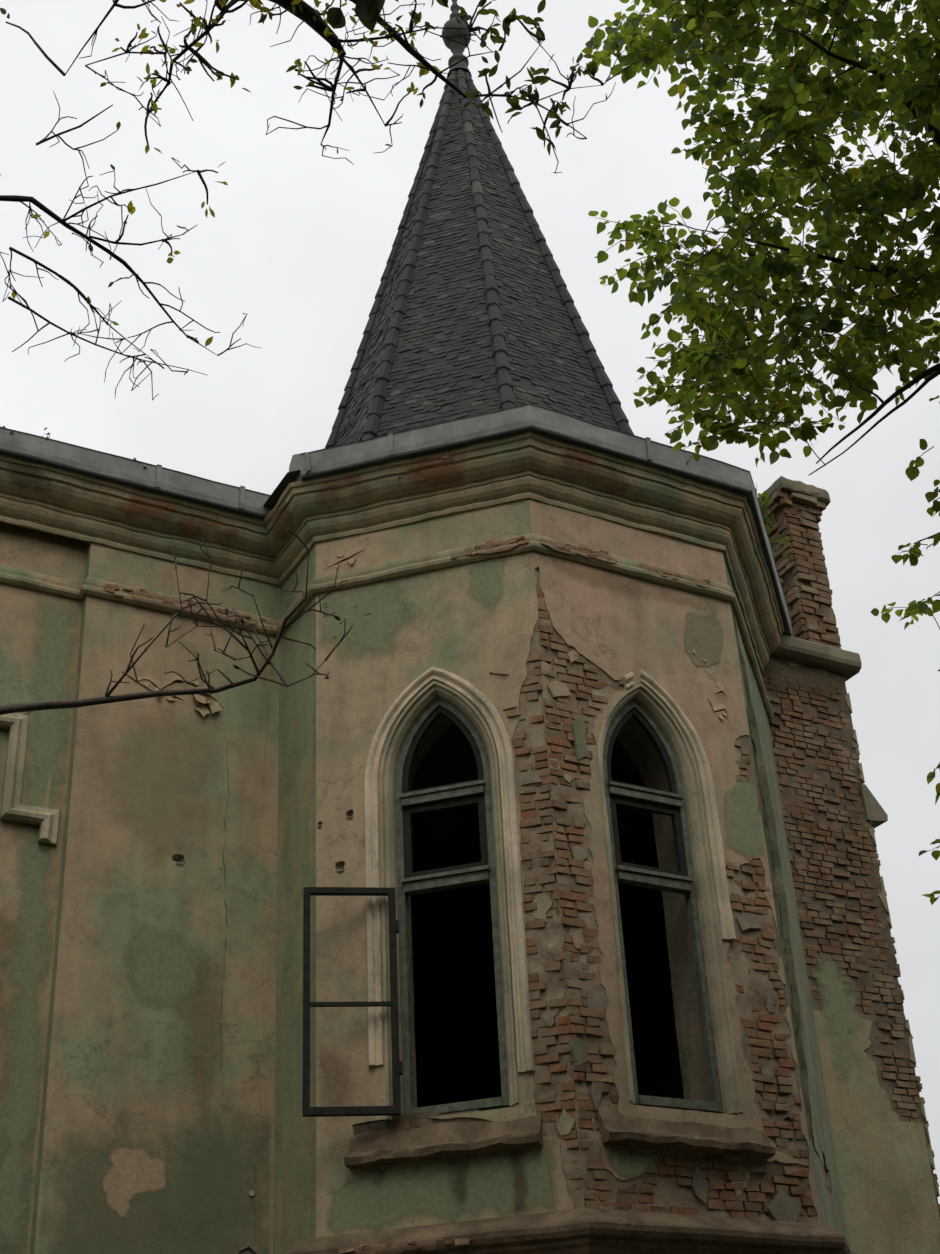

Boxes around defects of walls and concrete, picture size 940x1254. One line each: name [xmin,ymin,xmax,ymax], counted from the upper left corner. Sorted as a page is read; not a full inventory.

flaking render [353,1109,492,1135]
flaking render [500,567,817,1223]
flaking render [762,656,940,1218]